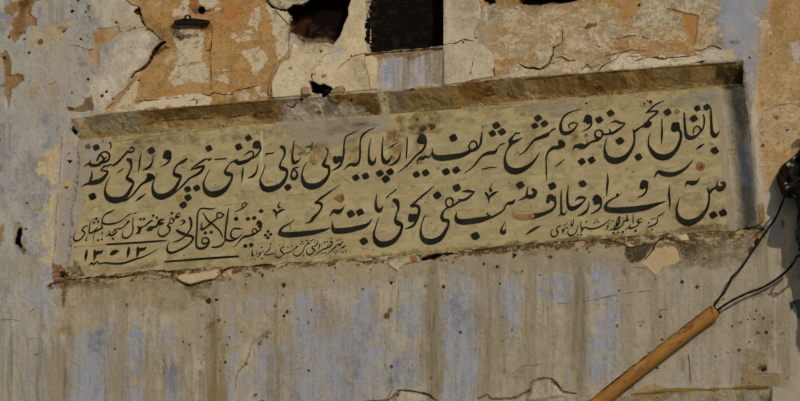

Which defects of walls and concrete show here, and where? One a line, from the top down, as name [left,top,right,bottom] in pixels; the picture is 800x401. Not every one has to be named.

peeling [0,0,73,51]
peeling [87,8,183,68]
flaking render [287,9,339,44]
crack [520,18,722,71]
peeling [666,8,698,46]
peeling [0,51,25,108]
peeling [28,84,93,112]
spalling [90,261,327,290]
spalling [337,254,461,273]
spalling [530,230,763,275]
crack [372,378,437,401]
crack [477,363,598,400]